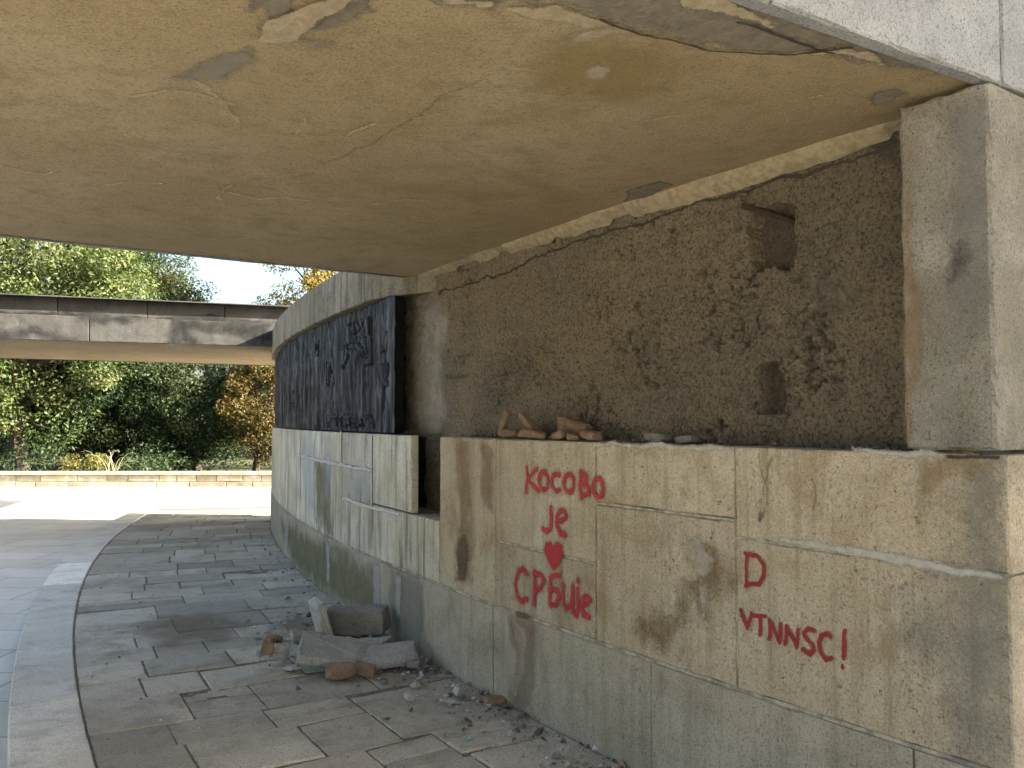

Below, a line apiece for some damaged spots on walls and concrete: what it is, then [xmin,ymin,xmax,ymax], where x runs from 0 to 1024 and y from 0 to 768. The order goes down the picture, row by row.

flaking render [171,0,371,82]
flaking render [430,0,926,70]
peeling [417,119,902,277]
crack [439,141,900,295]